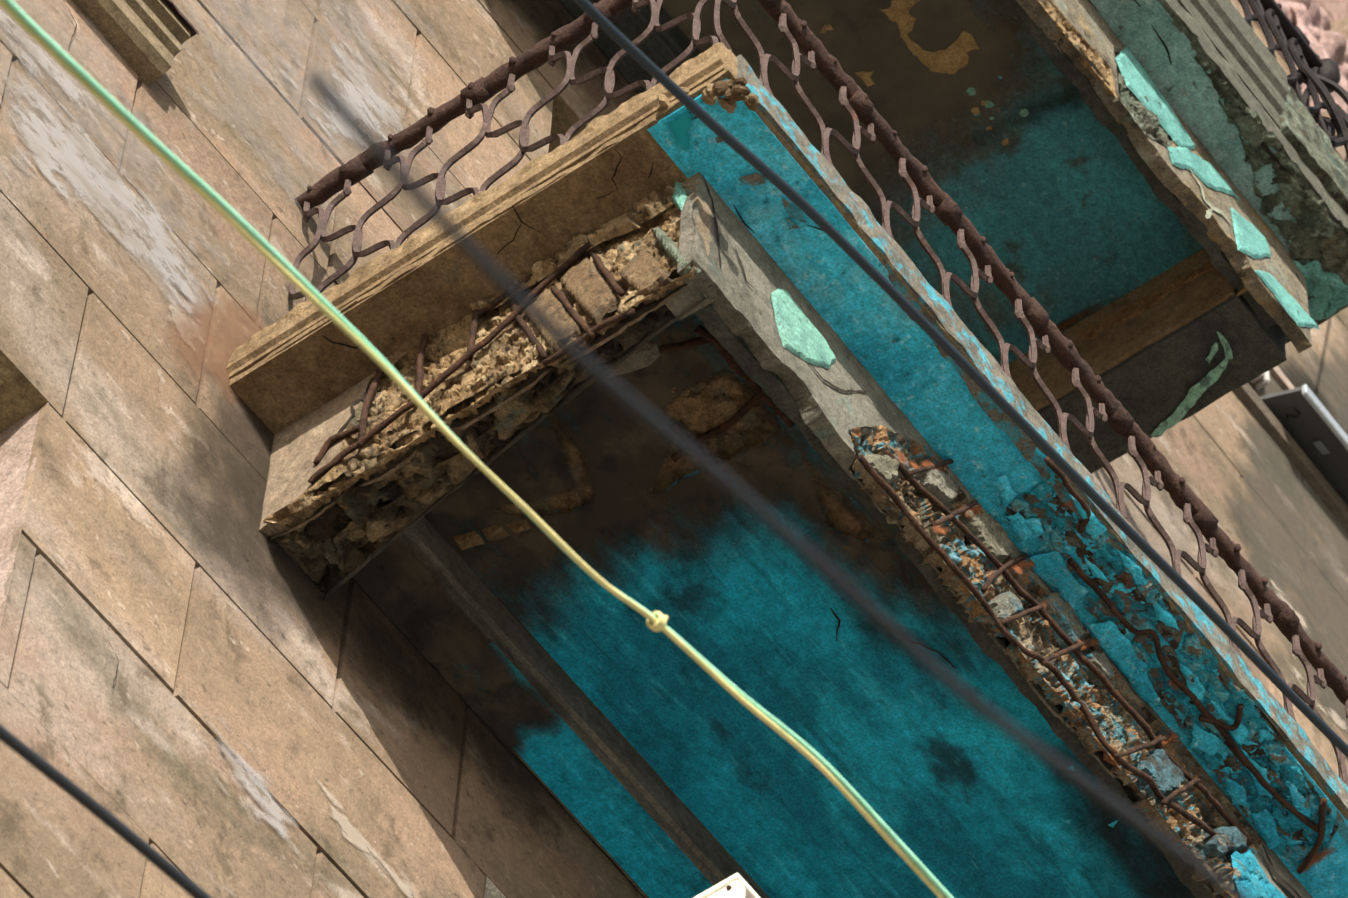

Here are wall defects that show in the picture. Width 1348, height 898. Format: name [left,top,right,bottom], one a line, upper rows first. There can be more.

peeling [879,0,979,74]
peeling [855,71,875,87]
peeling [967,87,994,131]
spalling [1036,0,1348,329]
flaking render [771,288,836,369]
spalling [263,182,701,575]
spalling [608,325,794,495]
spalling [849,259,1348,898]
rust [1299,848,1335,872]